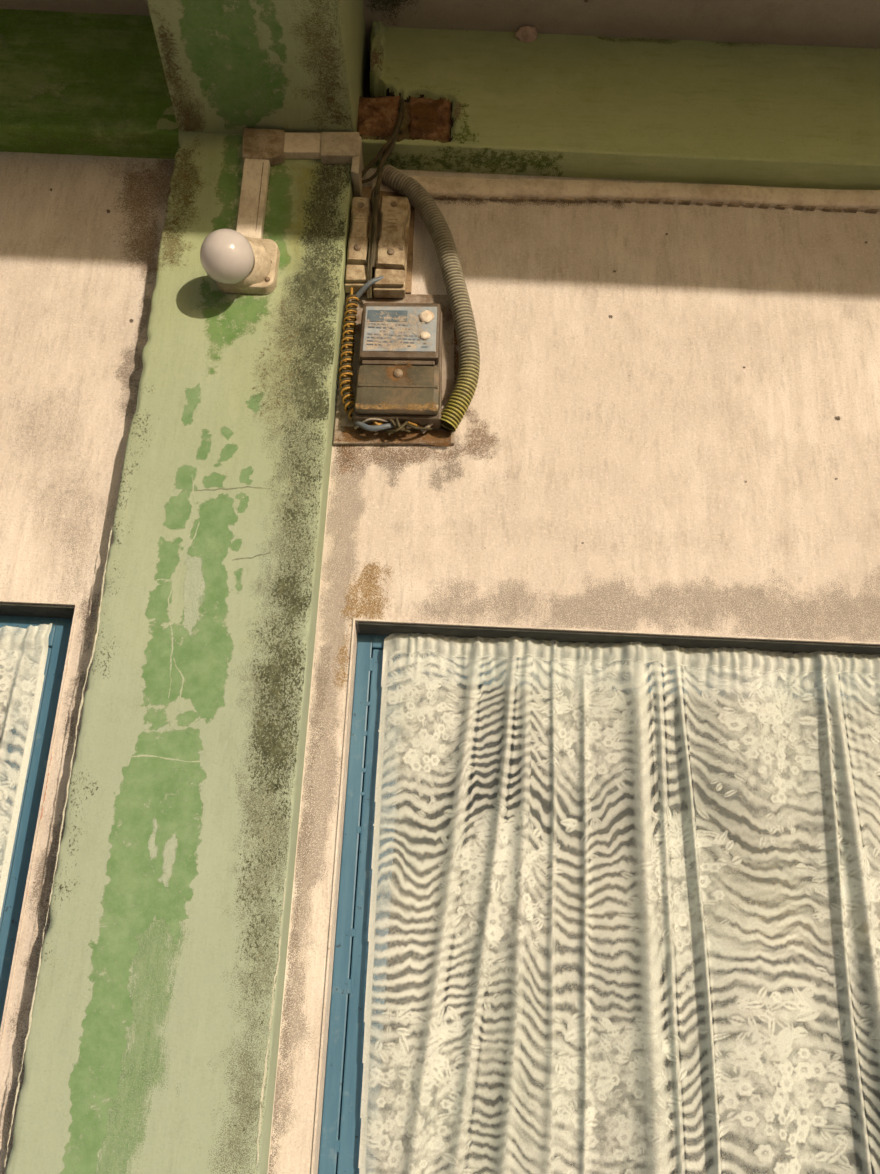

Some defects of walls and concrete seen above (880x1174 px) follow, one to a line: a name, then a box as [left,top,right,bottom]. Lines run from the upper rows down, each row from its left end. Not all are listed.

spalling [357,86,464,143]
peeling [211,134,243,232]
peeling [263,163,295,273]
damp [428,428,465,492]
damp [0,4,206,1174]
peeling [60,278,275,1174]
crack [128,754,218,764]
crack [152,474,266,699]
damp [208,159,412,1174]
rust [328,559,394,690]
damp [412,565,880,642]
spalling [256,878,286,1167]